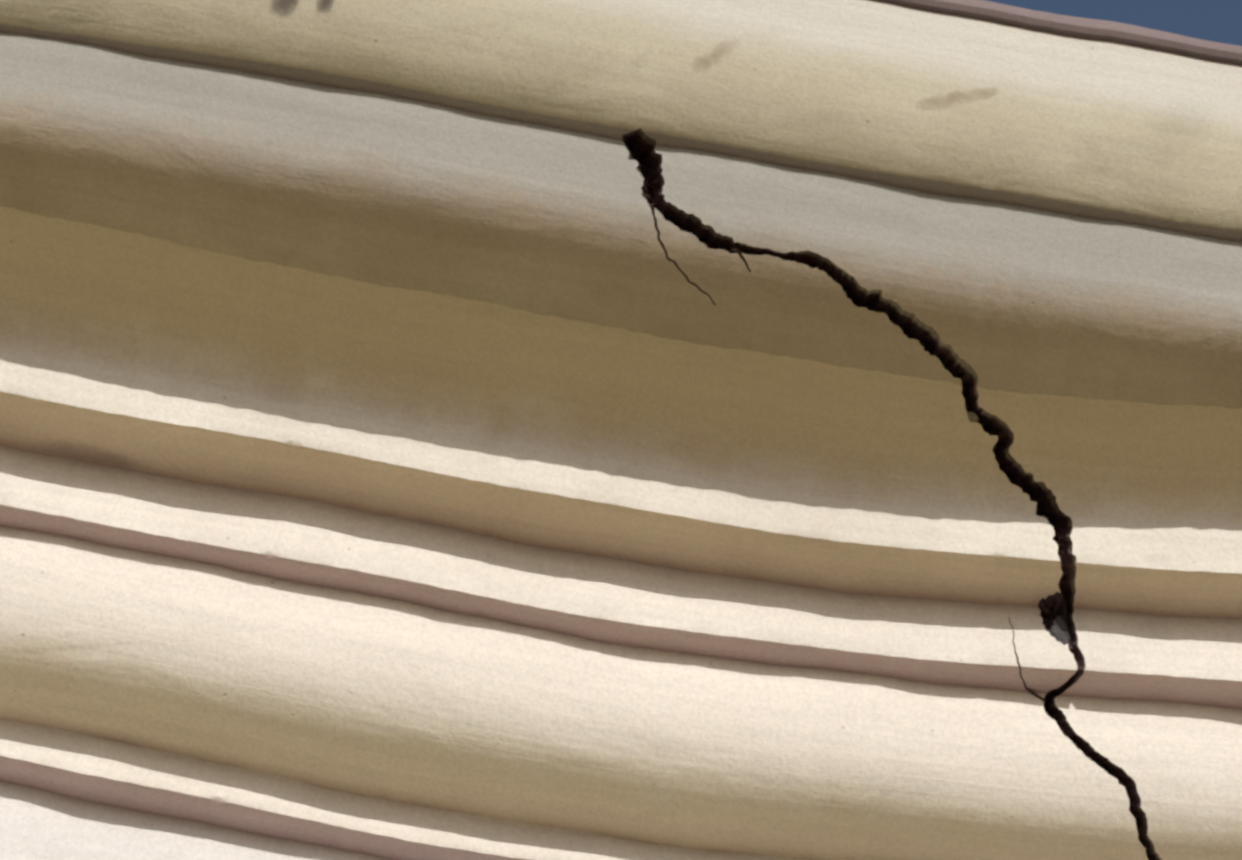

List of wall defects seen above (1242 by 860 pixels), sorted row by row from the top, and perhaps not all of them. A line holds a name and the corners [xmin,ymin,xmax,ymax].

crack [622,129,1161,860]